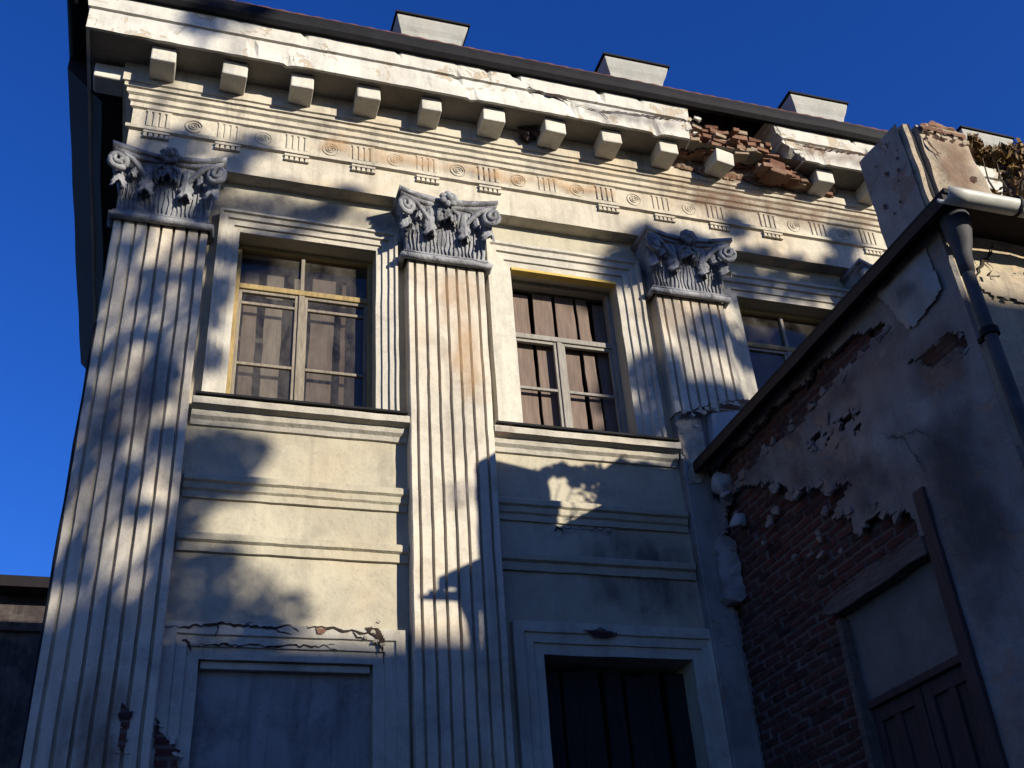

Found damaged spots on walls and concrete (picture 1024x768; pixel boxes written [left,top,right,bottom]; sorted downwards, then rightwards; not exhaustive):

spalling [674,116,813,193]
flaking render [919,121,970,147]
peeling [675,399,749,484]
flaking render [716,325,919,768]
crack [165,620,386,664]
spalling [109,703,133,755]
flaking render [153,718,183,768]